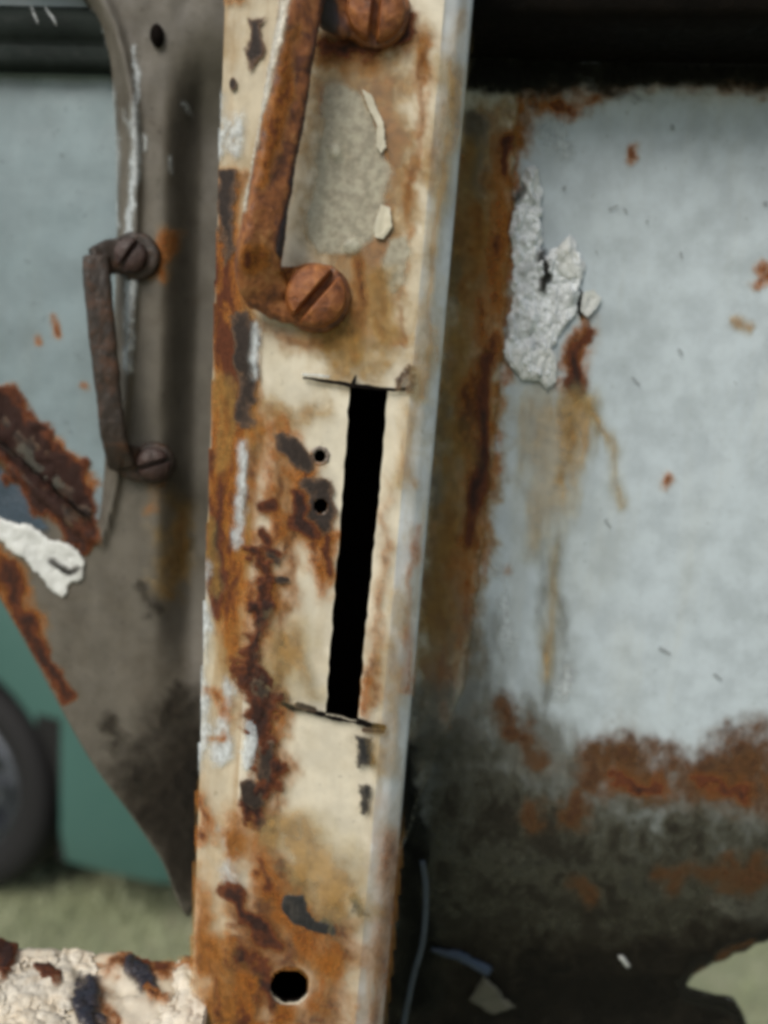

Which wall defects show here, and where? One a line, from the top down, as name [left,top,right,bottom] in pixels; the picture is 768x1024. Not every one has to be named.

corrosion [276,12,431,377]
peeling [308,86,409,287]
peeling [503,166,601,389]
corrosion [0,551,77,705]
peeling [0,470,85,598]
corrosion [0,384,102,556]
corrosion [71,171,358,1024]
corrosion [419,58,768,730]
corrosion [493,696,548,771]
corrosion [559,719,768,828]
corrosion [0,937,19,979]
corrosion [33,961,62,983]